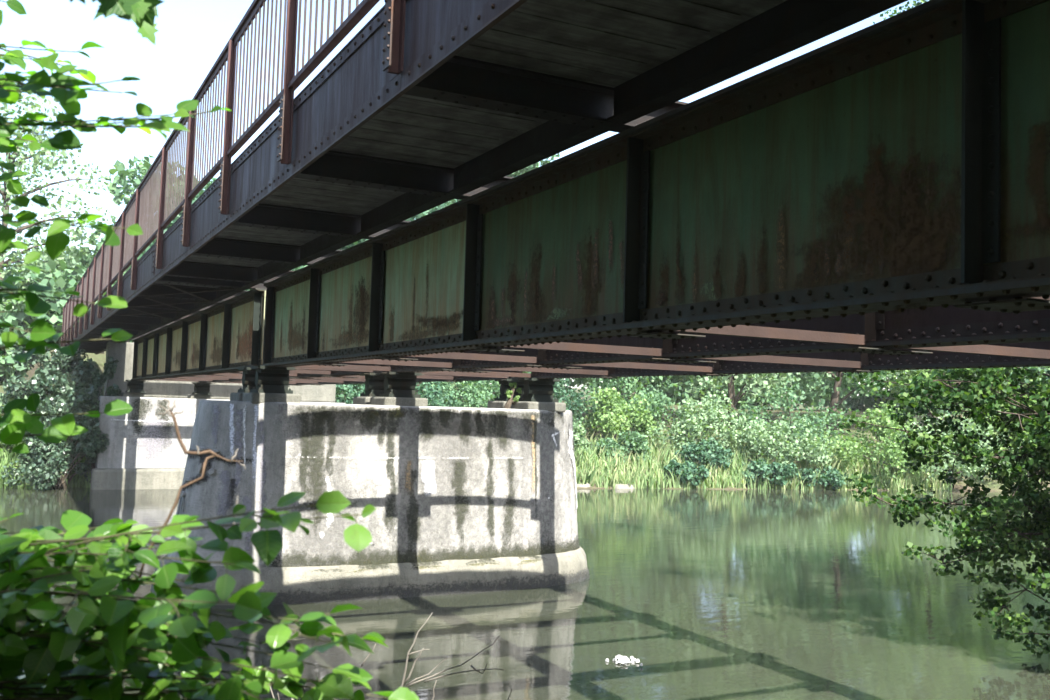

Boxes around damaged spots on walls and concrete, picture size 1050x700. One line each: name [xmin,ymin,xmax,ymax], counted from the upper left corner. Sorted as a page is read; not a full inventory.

corrosion [322,280,371,350]
corrosion [390,264,463,341]
leakage [299,408,336,538]
leakage [361,408,435,546]
leakage [421,409,515,542]